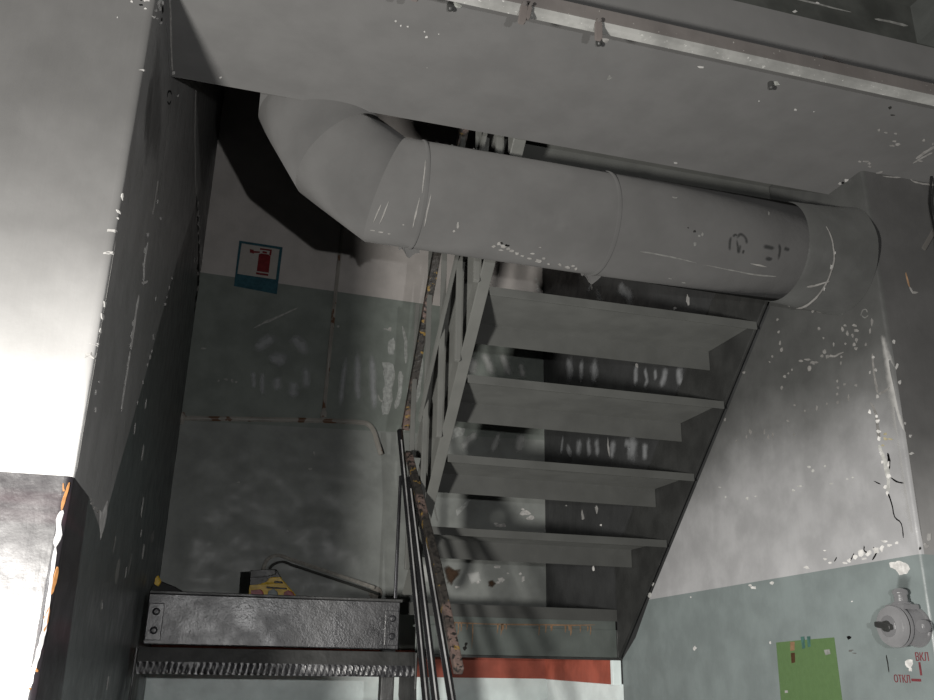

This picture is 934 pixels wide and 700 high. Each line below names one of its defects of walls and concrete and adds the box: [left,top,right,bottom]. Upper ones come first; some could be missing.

peeling [121,296,139,412]
peeling [780,309,873,390]
crack [868,354,904,538]
flaking render [823,540,898,564]
flaking render [889,561,910,575]